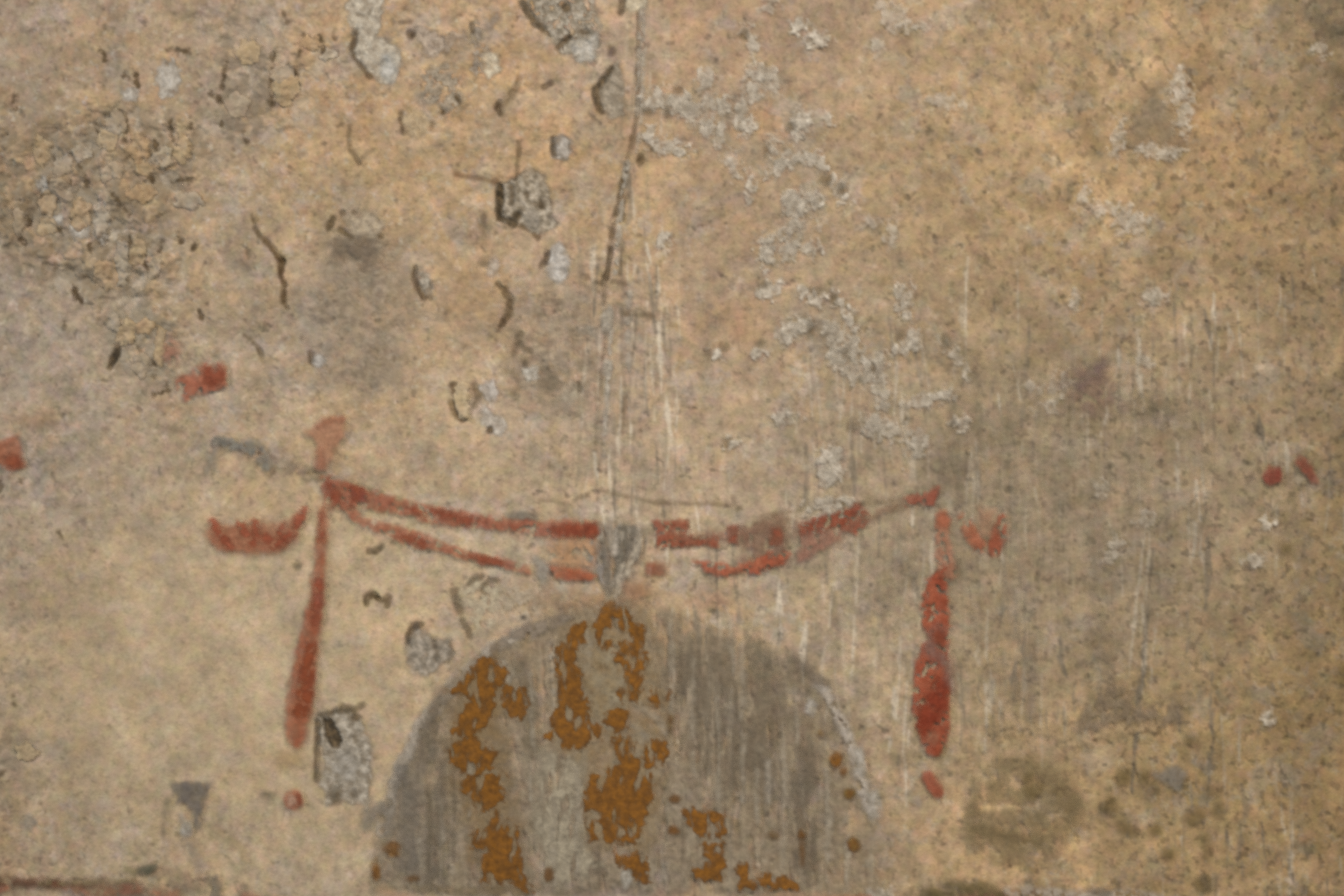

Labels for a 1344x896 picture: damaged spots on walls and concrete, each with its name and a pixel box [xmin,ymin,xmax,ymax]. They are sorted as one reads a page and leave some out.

flaking render [156,48,189,99]
spalling [521,0,624,119]
flaking render [13,74,204,291]
crack [254,221,288,308]
spalling [496,170,569,282]
spalling [551,135,571,159]
flaking render [104,308,171,396]
spalling [315,703,372,806]